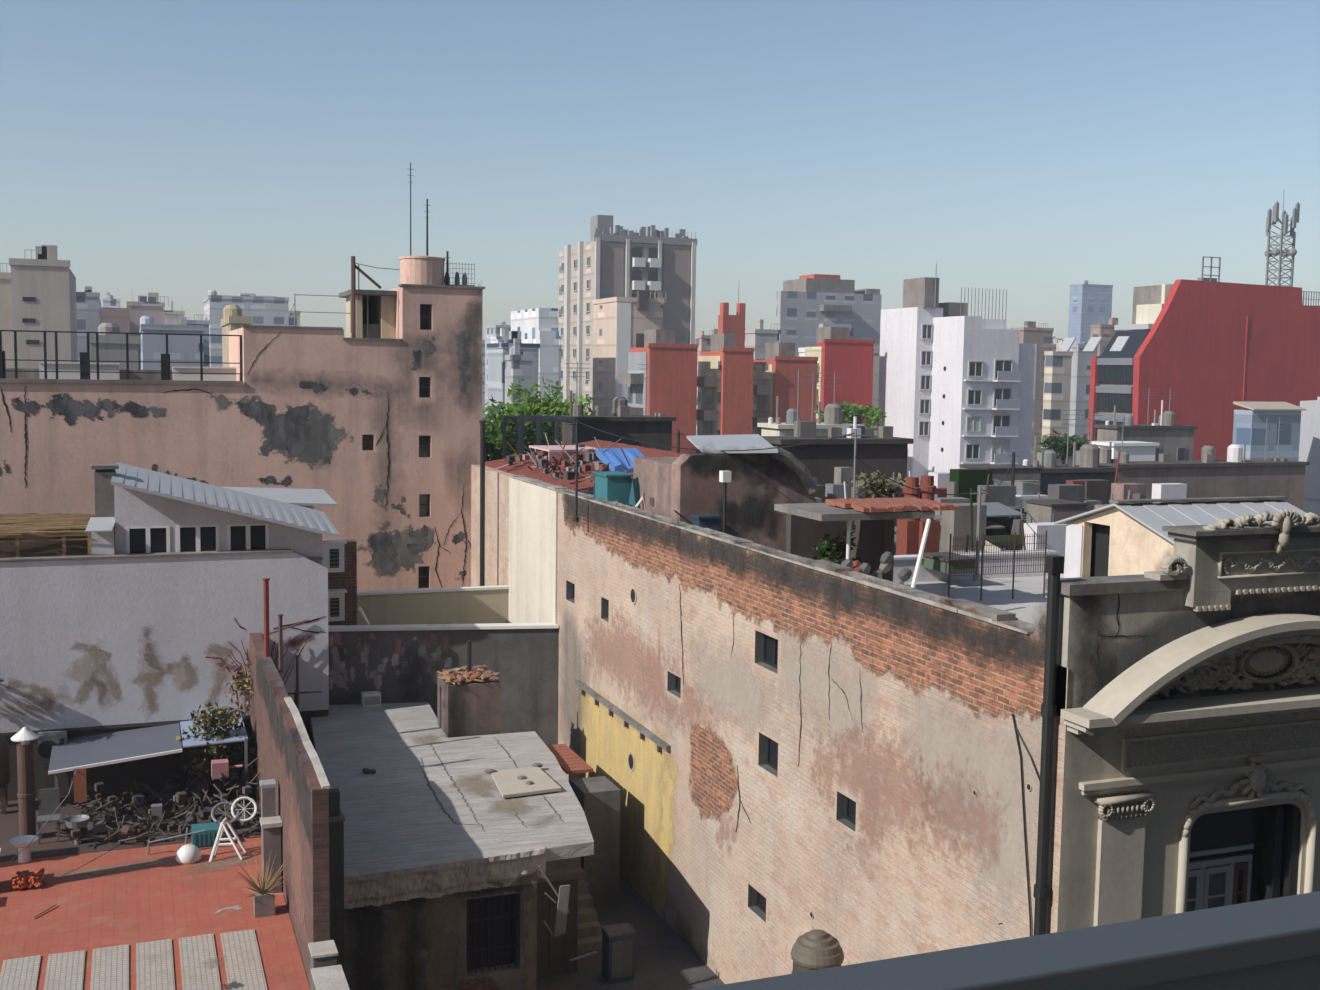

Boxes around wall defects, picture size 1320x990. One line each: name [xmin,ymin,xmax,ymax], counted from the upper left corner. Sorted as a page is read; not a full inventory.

crack [248,332,281,374]
crack [0,386,28,488]
peeling [11,393,166,426]
peeling [234,381,354,487]
crack [375,394,390,510]
peeling [357,484,434,578]
peeling [452,532,468,545]
flaking render [564,496,1045,720]
crack [798,644,863,765]
crack [421,739,485,832]
crack [514,793,564,828]
spalling [689,724,738,820]